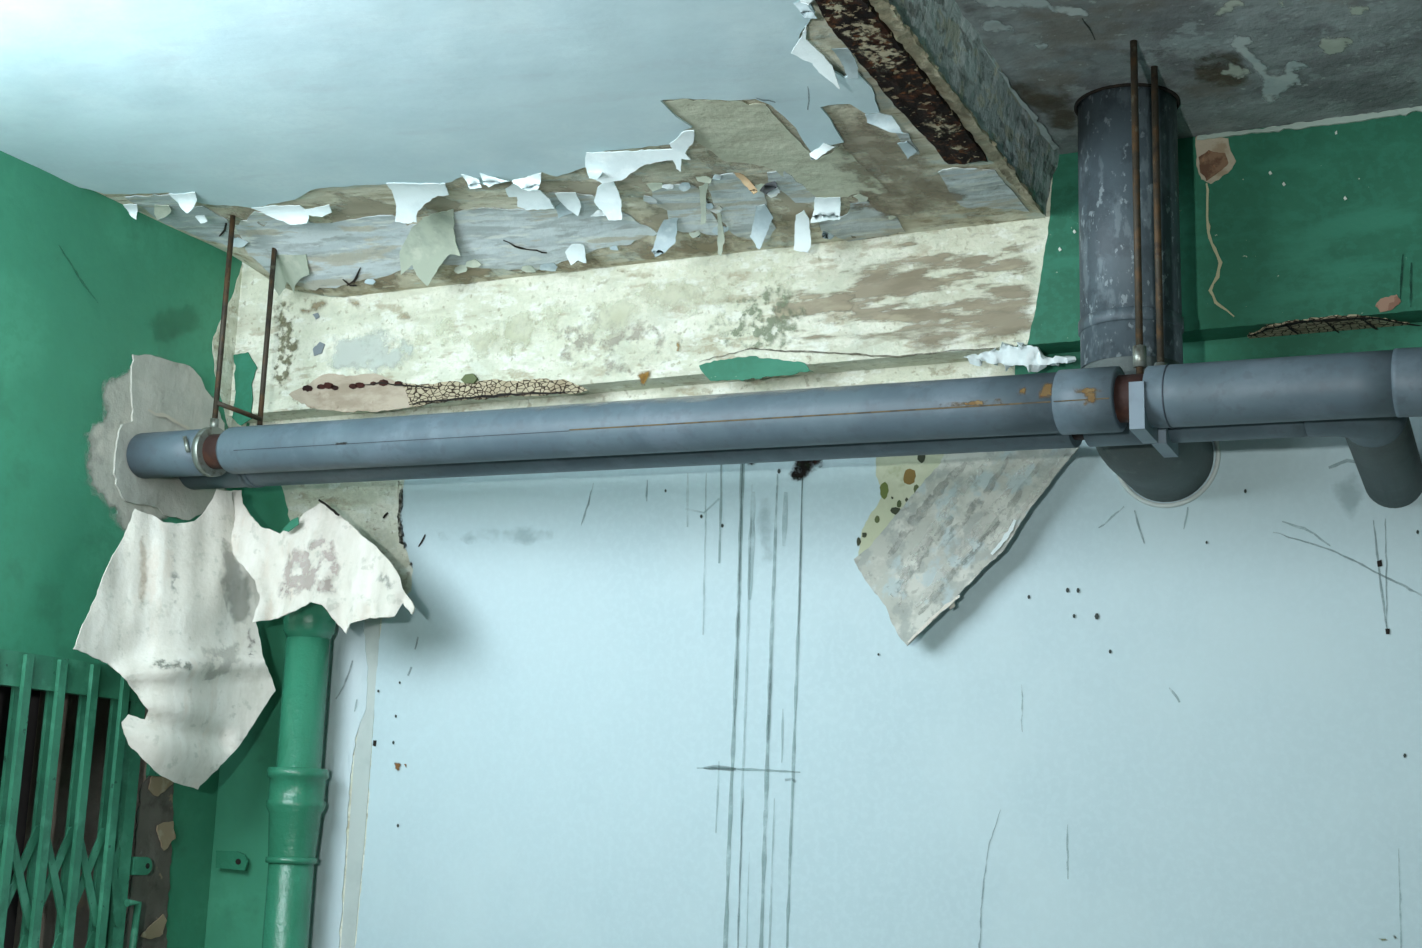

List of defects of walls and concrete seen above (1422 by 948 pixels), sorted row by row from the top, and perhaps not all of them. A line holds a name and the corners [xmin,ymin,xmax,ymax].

leakage [354,271,399,291]
leakage [333,333,422,373]
leakage [448,268,491,284]
leakage [540,260,598,272]
peeling [123,0,1044,428]
leakage [439,283,729,370]
leakage [673,237,741,255]
leakage [725,242,1032,348]
peeling [282,480,410,562]
peeling [857,454,944,555]